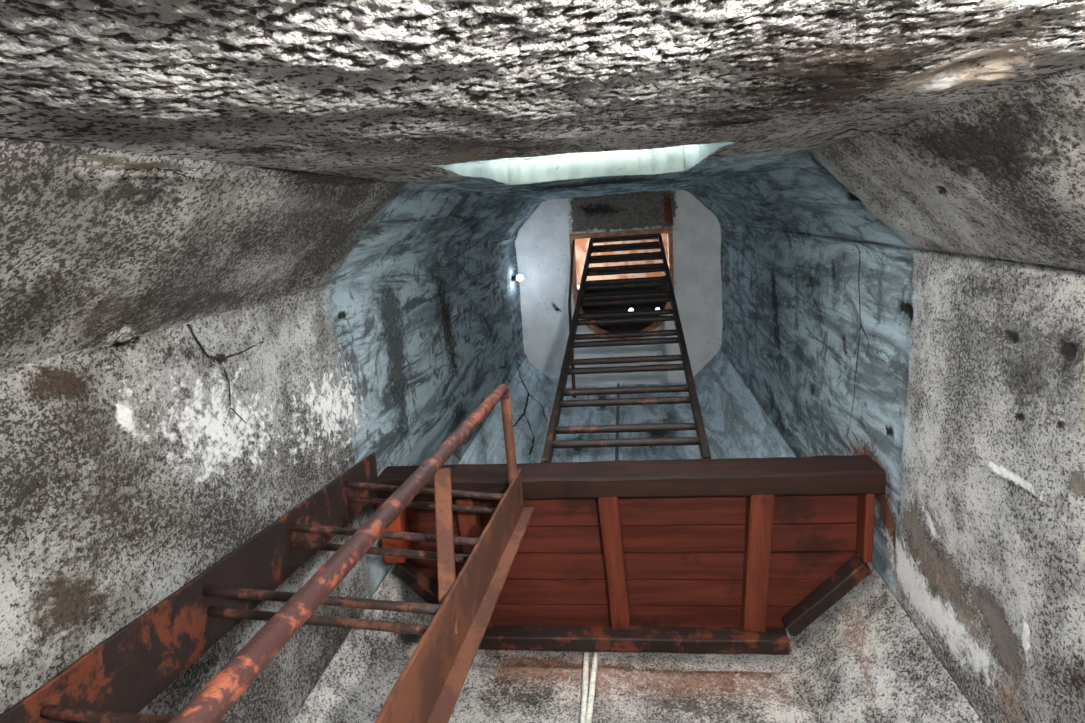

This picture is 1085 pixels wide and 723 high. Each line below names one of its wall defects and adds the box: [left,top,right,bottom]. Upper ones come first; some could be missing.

peeling [883,34,1046,96]
crack [188,324,264,427]